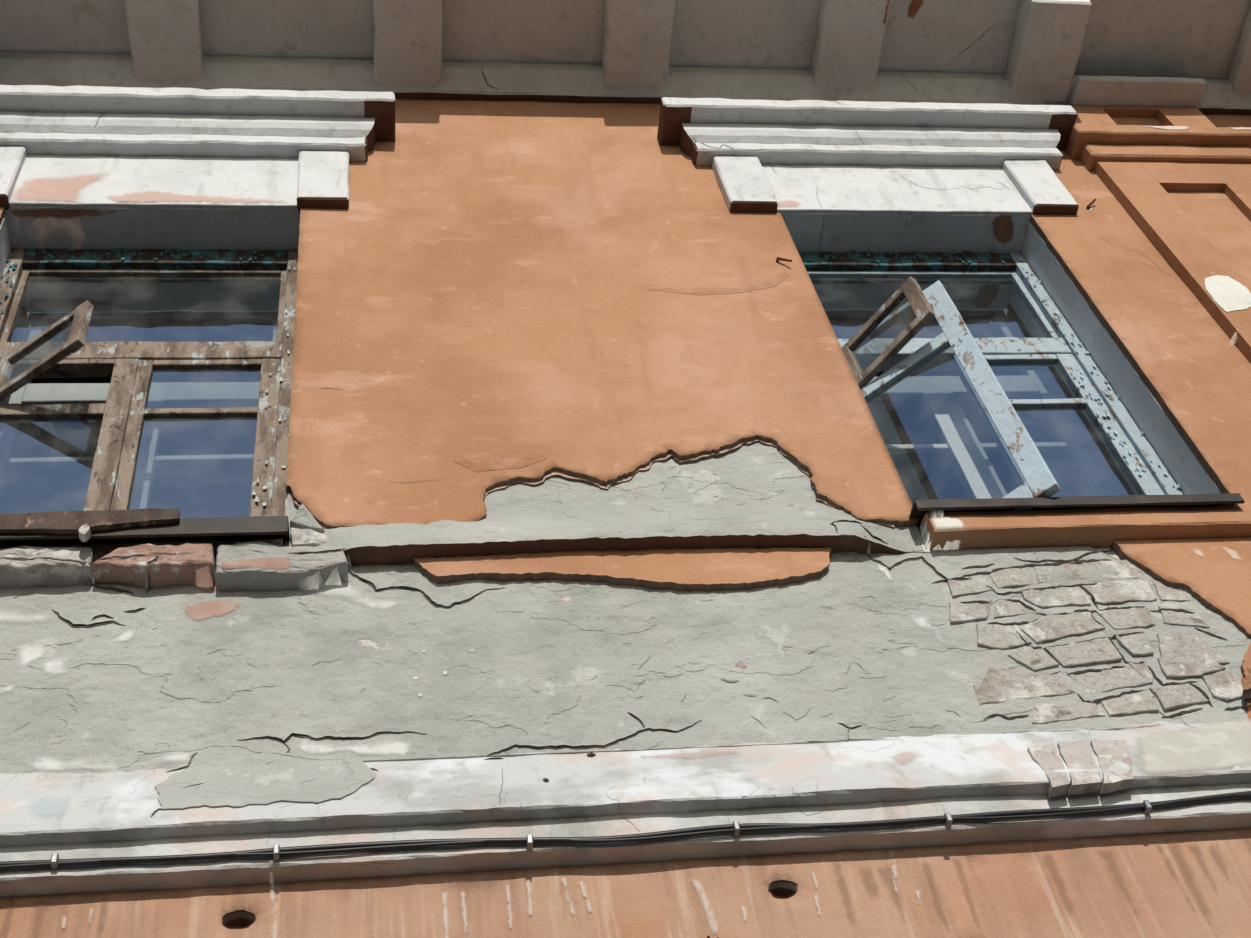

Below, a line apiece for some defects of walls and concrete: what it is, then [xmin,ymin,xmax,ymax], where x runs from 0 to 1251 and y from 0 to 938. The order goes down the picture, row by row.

rust [908,0,923,17]
flaking render [1205,275,1251,312]
crack [0,552,189,628]
crack [296,548,504,608]
flaking render [0,442,1251,810]
crack [721,678,863,742]
crack [242,730,427,765]
crack [481,694,701,802]
crack [150,752,210,817]
damp [695,882,716,931]